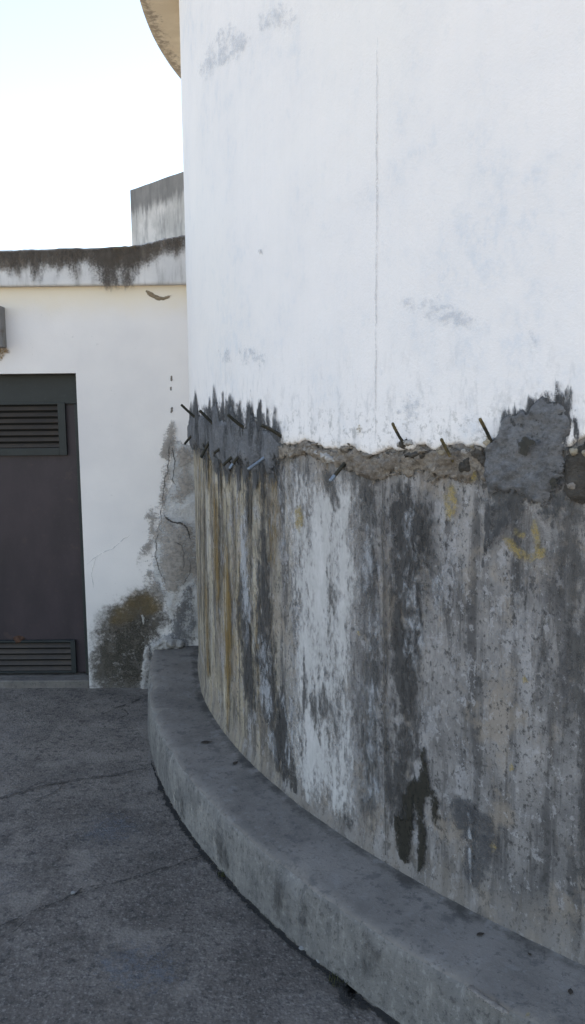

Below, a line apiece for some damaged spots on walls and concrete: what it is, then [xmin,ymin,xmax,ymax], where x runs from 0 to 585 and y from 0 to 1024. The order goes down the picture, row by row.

water stain [97,238,183,289]
spalling [549,442,585,504]
water stain [89,469,255,719]
water stain [481,489,541,606]
water stain [276,698,296,794]
water stain [385,747,497,888]